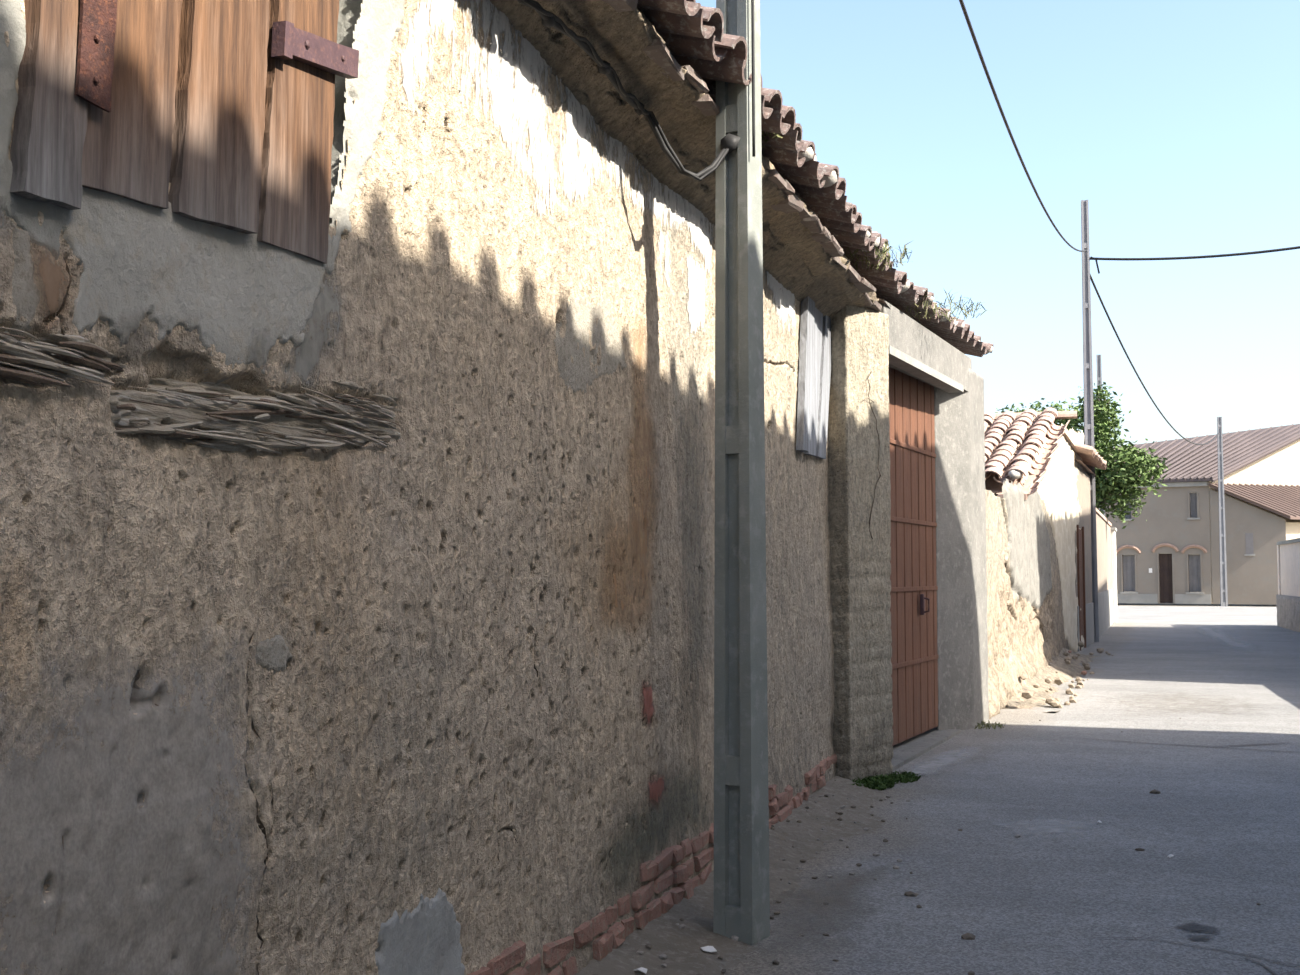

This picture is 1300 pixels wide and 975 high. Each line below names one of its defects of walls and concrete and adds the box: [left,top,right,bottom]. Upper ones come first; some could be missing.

peeling [399,0,713,333]
crack [863,371,881,539]
crack [244,674,273,880]
crack [256,915,264,975]